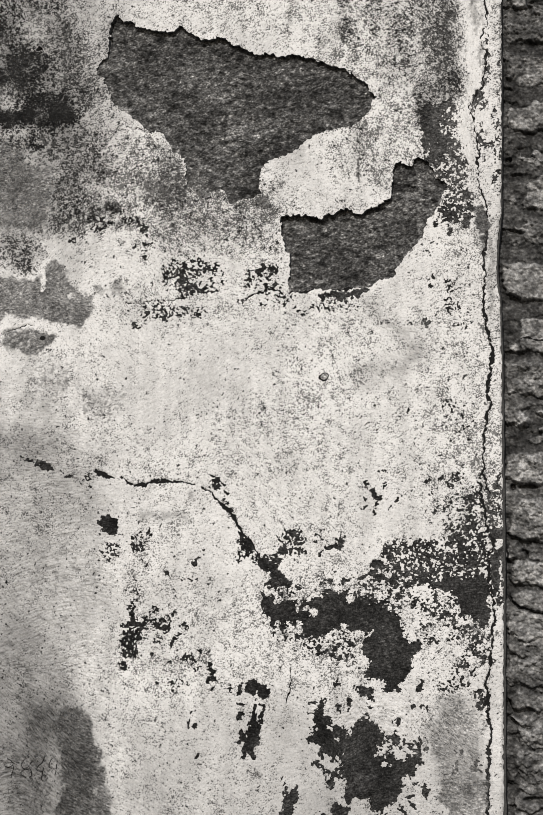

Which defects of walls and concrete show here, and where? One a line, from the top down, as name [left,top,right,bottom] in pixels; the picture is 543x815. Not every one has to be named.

spalling [96,14,377,204]
leakage [0,0,276,355]
spalling [244,34,502,316]
peeling [131,254,227,329]
crack [468,0,534,815]
peeling [94,513,153,567]
crack [95,469,290,586]
peeling [118,574,189,671]
peeling [155,649,218,693]
peeling [227,469,504,815]
leakage [29,706,111,815]